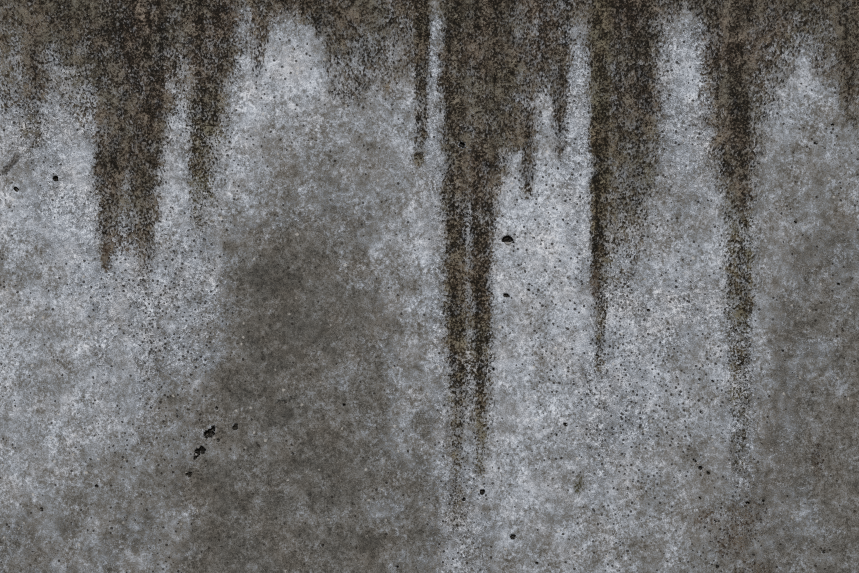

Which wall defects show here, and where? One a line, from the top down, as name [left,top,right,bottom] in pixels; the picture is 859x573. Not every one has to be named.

water stain [411,408,434,442]
water stain [0,508,155,573]